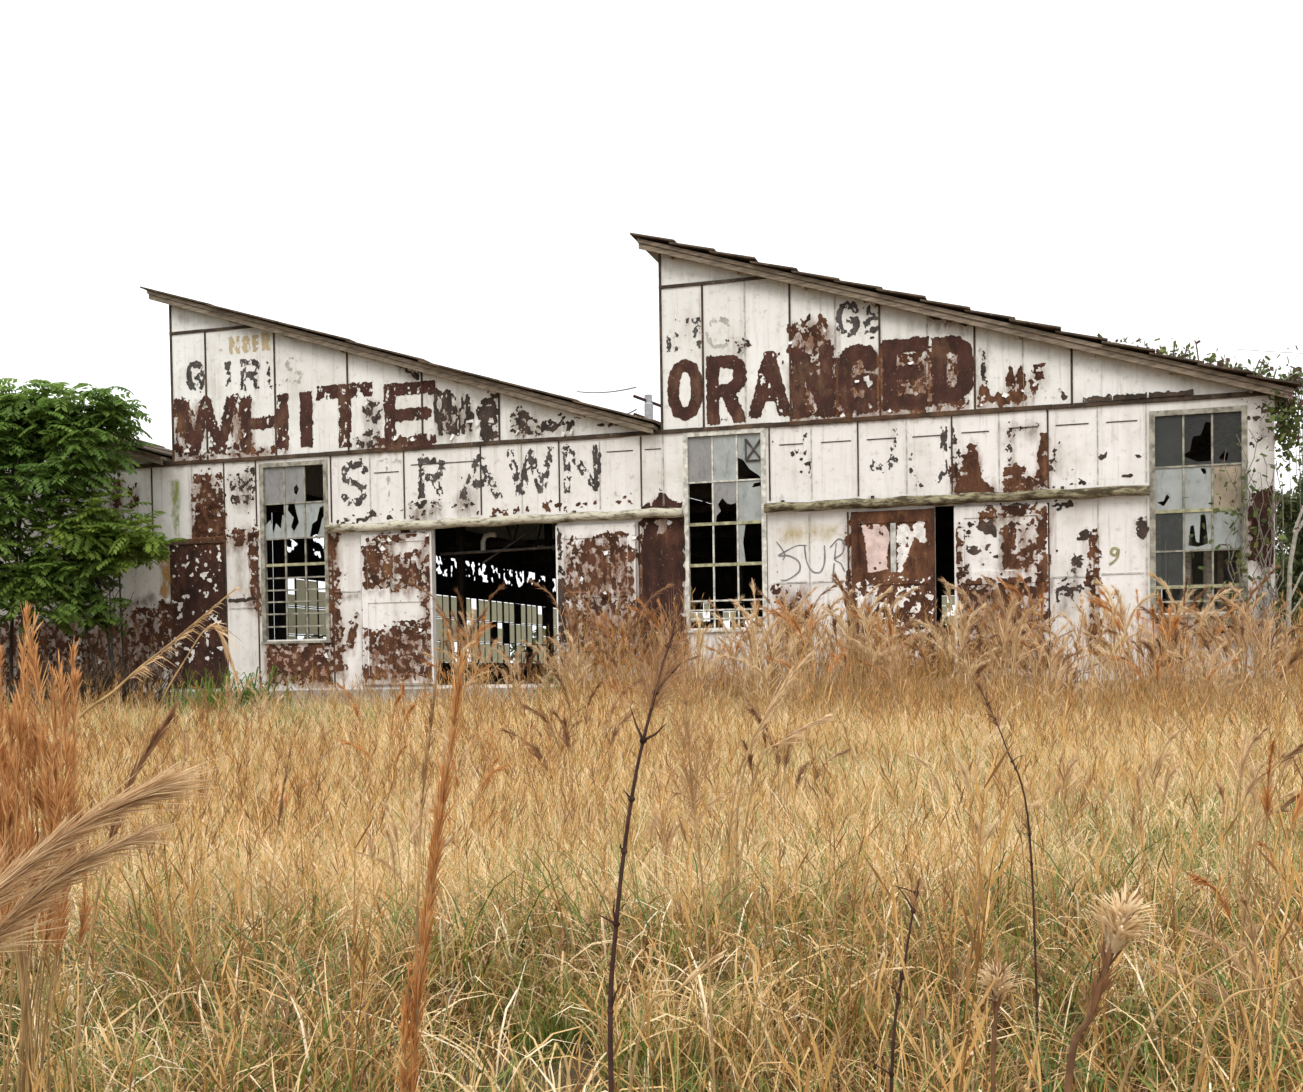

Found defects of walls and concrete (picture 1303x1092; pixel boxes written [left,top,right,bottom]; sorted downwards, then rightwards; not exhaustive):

peeling [154,441,288,673]
peeling [327,477,640,683]
corrosion [562,488,691,669]
peeling [855,521,934,665]
peeling [943,424,961,494]
peeling [956,516,999,580]
peeling [1047,441,1090,511]
peeling [1053,529,1096,622]